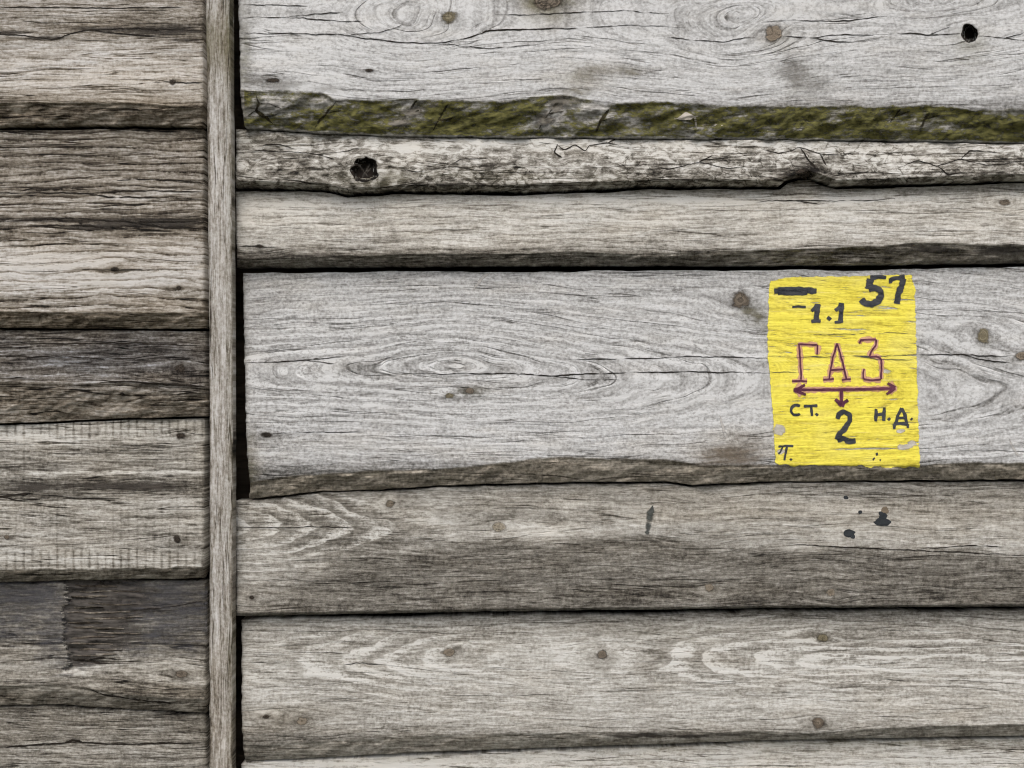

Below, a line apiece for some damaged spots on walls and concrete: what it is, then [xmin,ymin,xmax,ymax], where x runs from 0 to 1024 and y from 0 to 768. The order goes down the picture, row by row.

crack [539,103,617,157]
crack [902,150,1019,175]